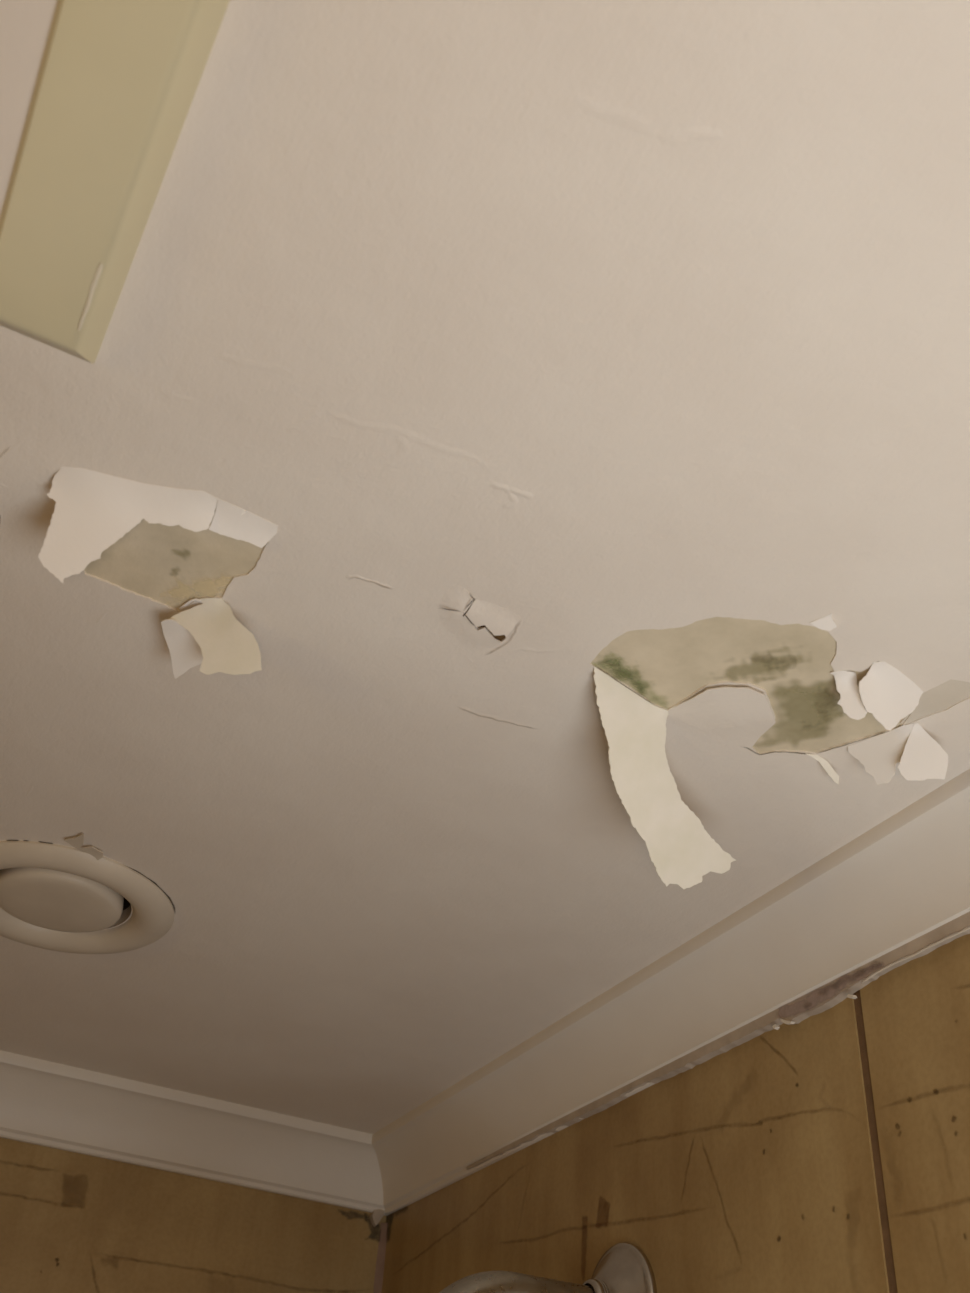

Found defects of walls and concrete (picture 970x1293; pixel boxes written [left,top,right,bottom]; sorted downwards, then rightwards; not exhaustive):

peeling [38,466,278,679]
peeling [591,613,970,889]